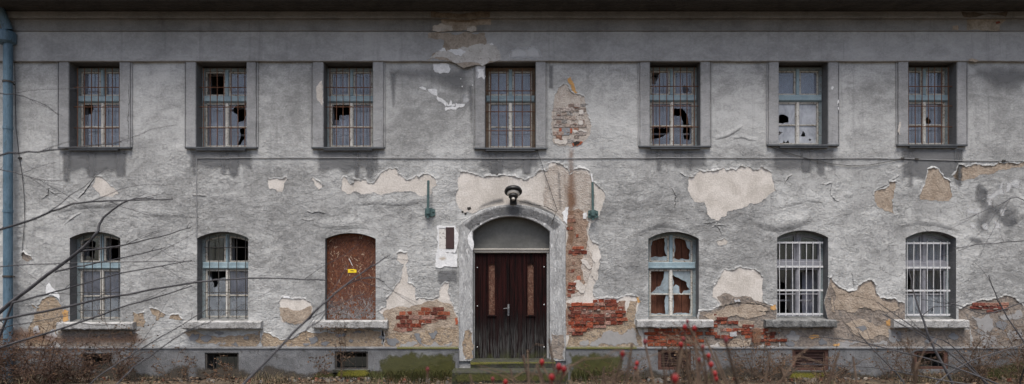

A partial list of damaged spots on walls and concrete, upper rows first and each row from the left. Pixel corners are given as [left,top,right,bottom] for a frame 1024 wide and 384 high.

spalling [427,11,501,87]
peeling [419,87,465,111]
spalling [550,77,592,148]
spalling [339,166,438,196]
spalling [454,160,1024,360]
spalling [25,249,474,360]